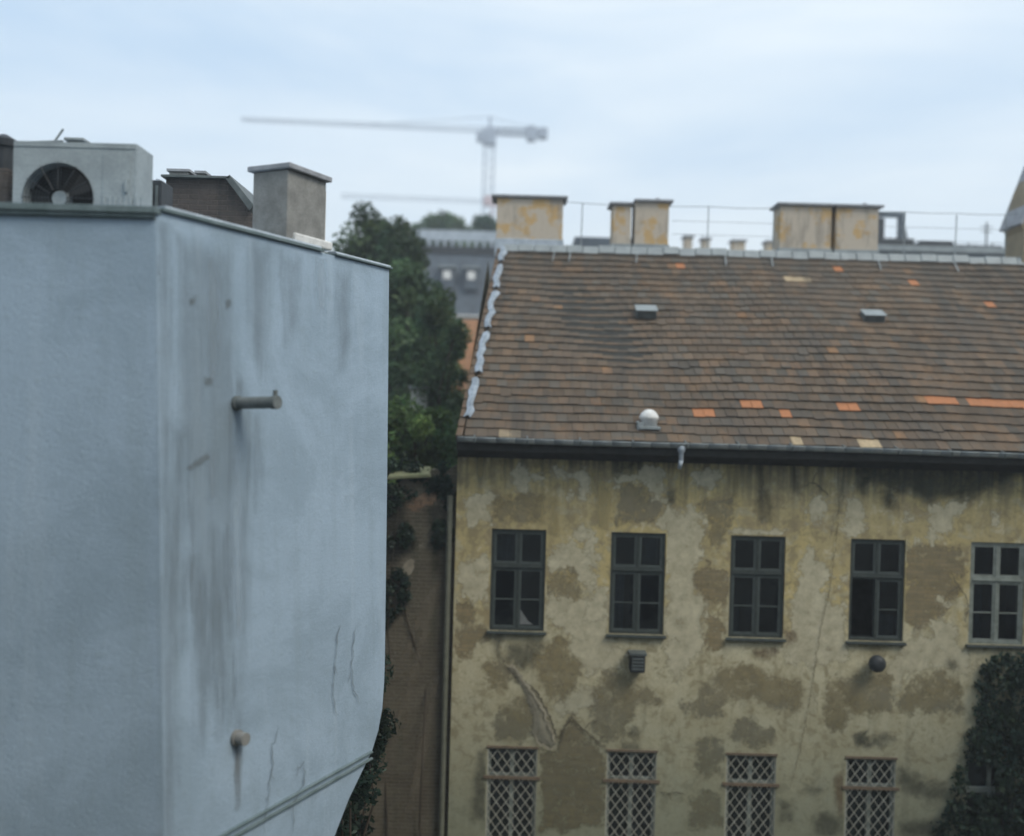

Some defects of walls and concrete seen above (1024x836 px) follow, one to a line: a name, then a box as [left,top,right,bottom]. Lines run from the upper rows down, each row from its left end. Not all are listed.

peeling [459,491,500,529]
peeling [839,487,869,539]
damp [859,468,1018,506]
peeling [455,551,492,659]
flaking render [493,699,533,740]
flaking render [534,522,662,835]
peeling [507,460,788,684]
flaking render [688,717,775,829]
flaking render [680,661,802,717]
peeling [776,544,851,671]
crack [790,467,844,785]
flaking render [823,497,977,733]